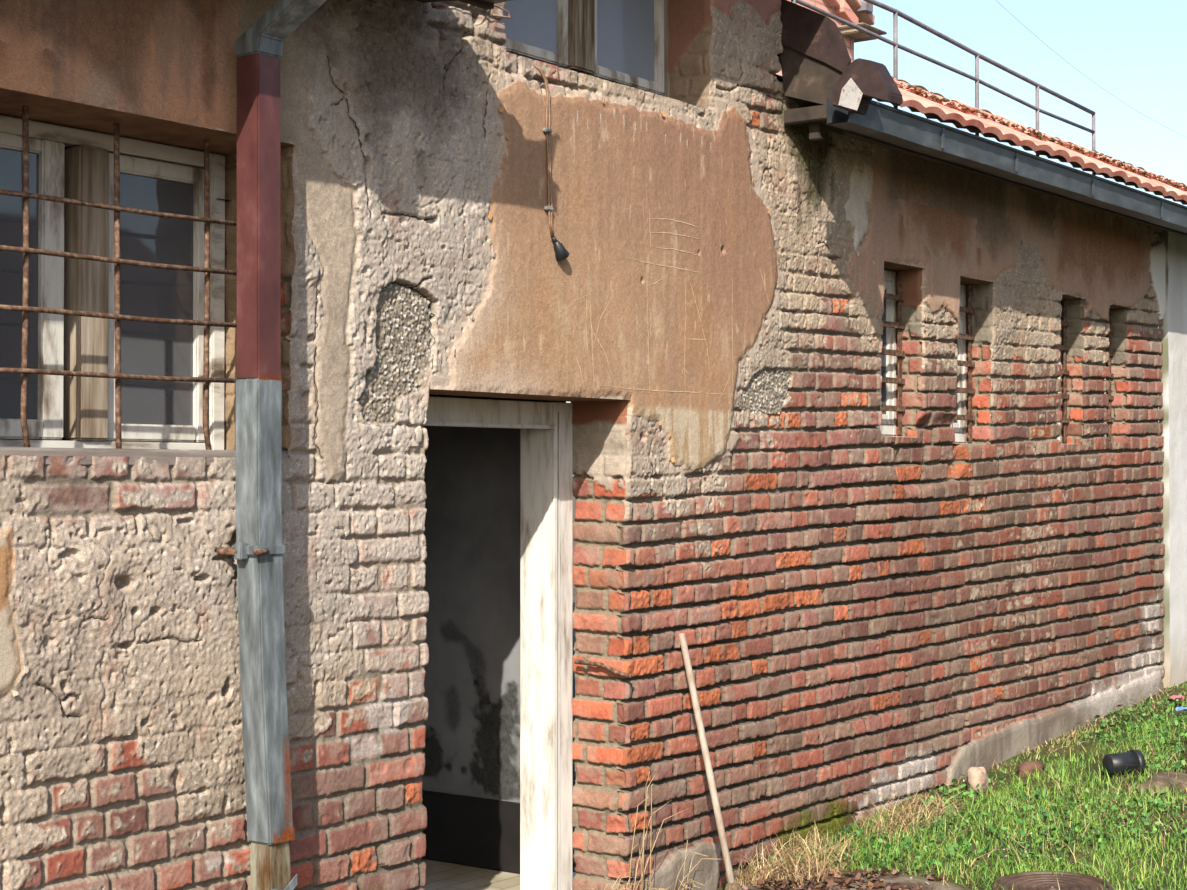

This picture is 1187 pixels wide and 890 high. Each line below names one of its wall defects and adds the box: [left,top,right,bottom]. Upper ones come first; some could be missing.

crack [327,56,437,221]
water stain [779,108,833,208]
peeling [919,288,960,352]
peeling [992,240,1064,363]
spalling [887,413,973,500]
crack [38,683,80,717]
peeling [0,502,244,760]
water stain [422,680,520,800]
spalling [619,720,664,785]
spalling [620,633,664,679]
spalling [699,578,848,677]
corrosion [273,827,295,844]